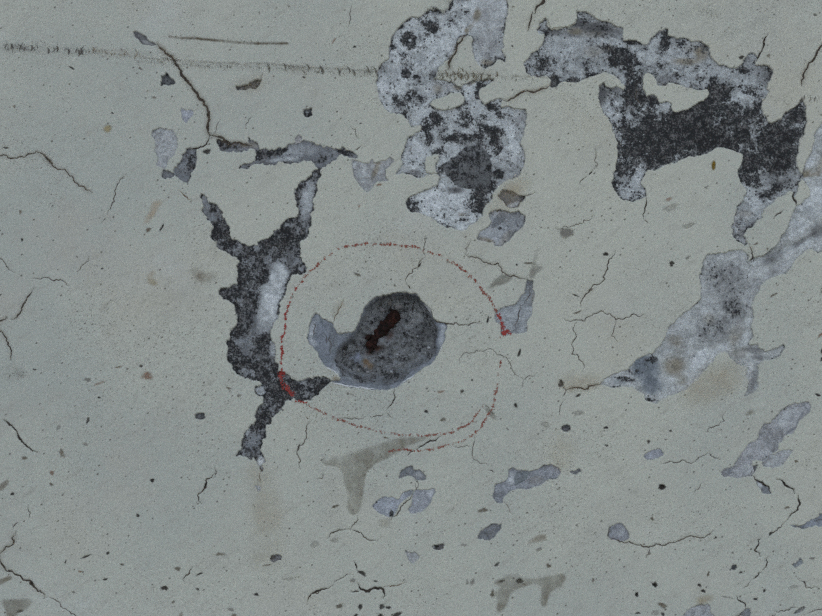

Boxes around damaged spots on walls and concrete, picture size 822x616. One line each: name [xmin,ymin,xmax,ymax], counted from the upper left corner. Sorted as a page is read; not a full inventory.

peeling [161,73,175,86]
crack [157,44,252,149]
crack [0,151,91,192]
peeling [151,128,210,183]
peeling [200,0,527,472]
peeling [524,5,822,403]
crack [0,259,89,360]
crack [559,254,644,415]
crack [6,421,36,452]
peeling [493,464,581,503]
peeling [721,402,811,494]
crack [737,475,801,616]